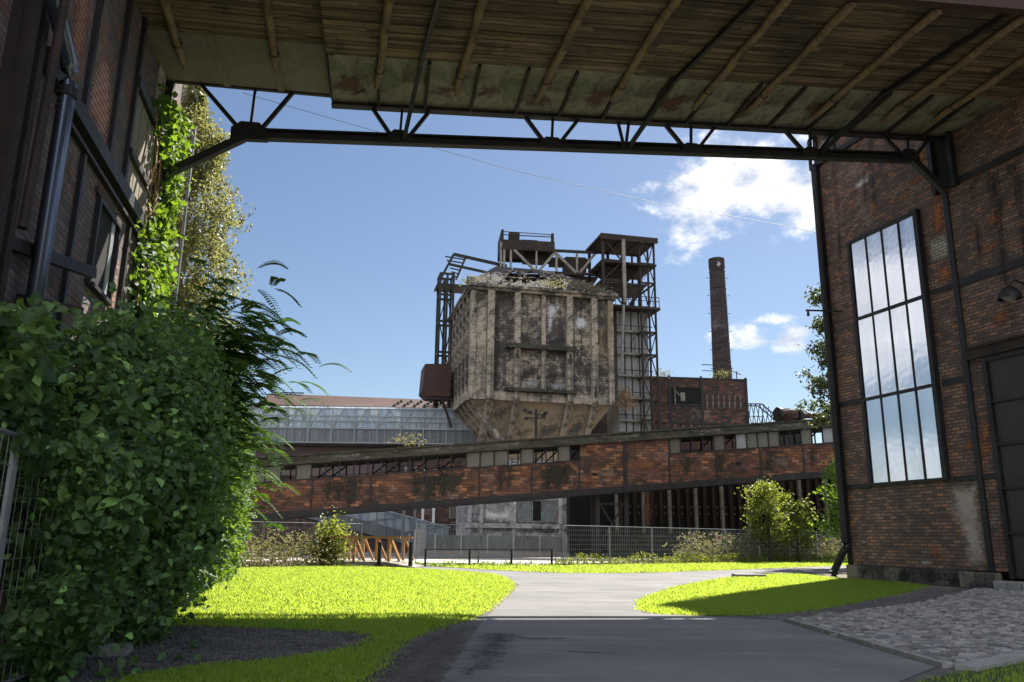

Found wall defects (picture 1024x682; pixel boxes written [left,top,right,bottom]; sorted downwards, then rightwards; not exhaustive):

efflorescence [952,483,986,564]